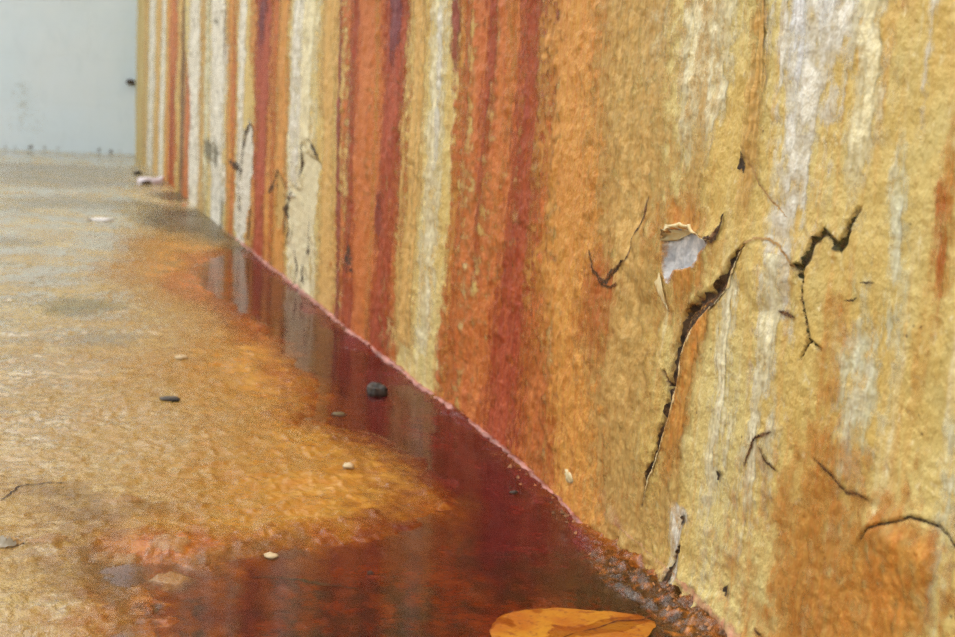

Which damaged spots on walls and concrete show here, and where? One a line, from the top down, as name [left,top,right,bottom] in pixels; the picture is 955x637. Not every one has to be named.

rust [736,0,767,206]
rust [73,0,741,637]
crack [589,197,649,288]
spalling [654,222,709,311]
crack [641,209,866,506]
crack [740,145,787,217]
rust [935,146,955,298]
crack [2,482,64,499]
rust [830,497,936,637]
crack [860,516,955,546]